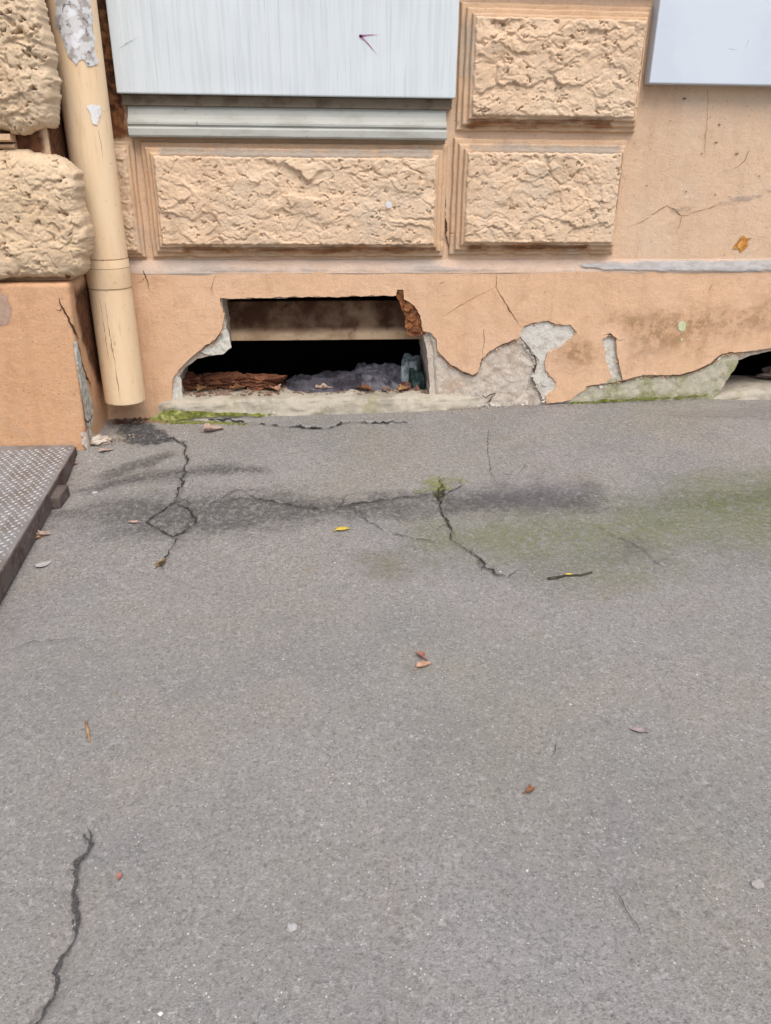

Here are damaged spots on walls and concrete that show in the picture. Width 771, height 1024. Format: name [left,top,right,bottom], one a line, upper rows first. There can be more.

crack [629,205,717,227]
crack [59,299,79,340]
flaking render [396,290,425,336]
crack [444,277,521,327]
flaking render [73,341,96,450]
flaking render [172,325,232,399]
crack [208,418,409,428]
flaking render [434,321,576,408]
flaking render [565,333,766,403]
crack [146,437,518,577]
crack [35,827,94,1024]